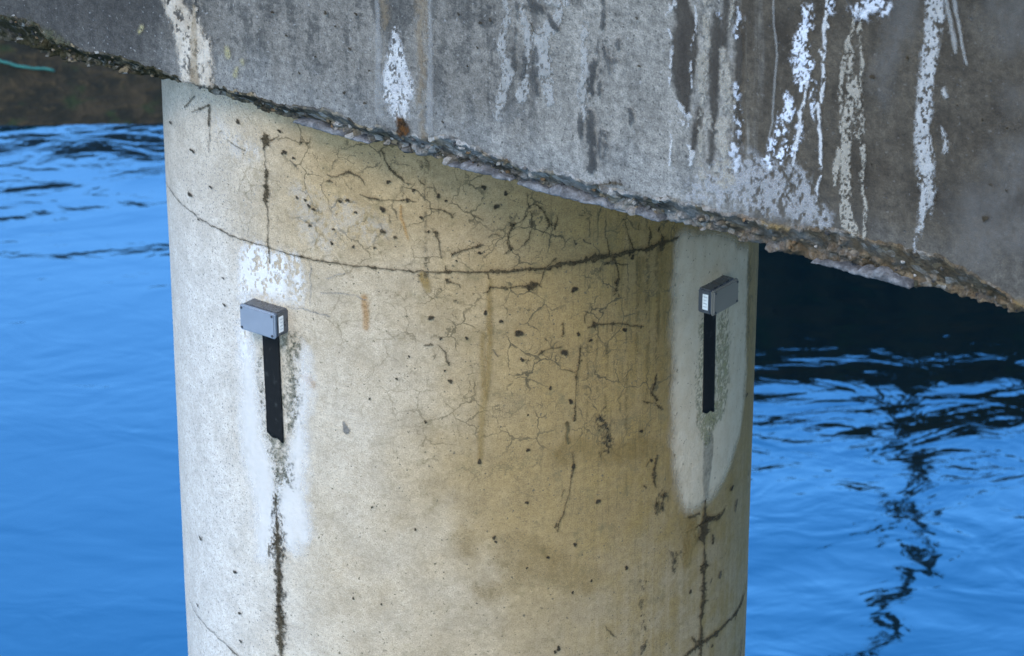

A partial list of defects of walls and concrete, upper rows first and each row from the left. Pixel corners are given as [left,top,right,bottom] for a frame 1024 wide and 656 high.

water stain [162,0,214,87]
water stain [376,32,412,119]
corrosion [395,117,409,137]
crack [165,96,690,301]
spalling [0,15,1024,313]
water stain [668,0,902,239]
water stain [913,0,966,252]
crack [524,313,644,422]
crack [643,374,663,410]
crack [644,455,667,505]
crack [268,494,284,656]
crack [685,499,747,656]